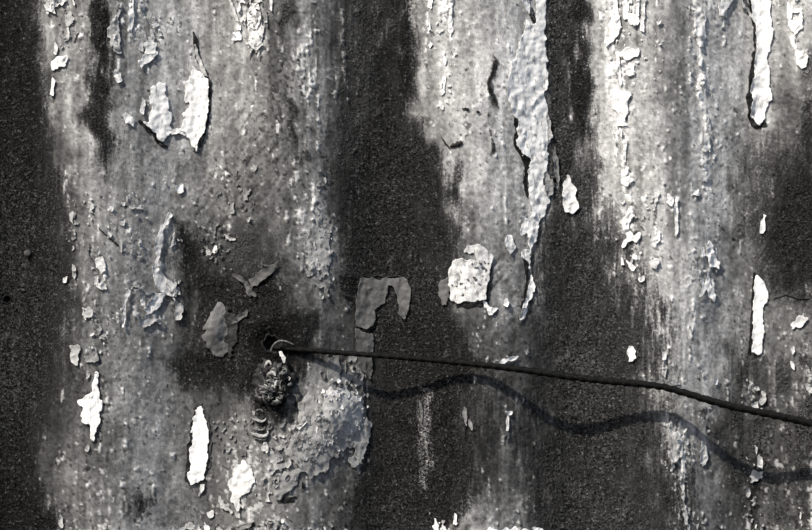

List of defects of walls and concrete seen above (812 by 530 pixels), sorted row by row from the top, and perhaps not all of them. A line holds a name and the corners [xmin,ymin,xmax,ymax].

damp [0,0,78,530]
damp [78,0,120,182]
peeling [70,212,184,452]
peeling [123,31,212,153]
damp [169,219,325,439]
damp [326,0,497,530]
peeling [438,244,509,316]
peeling [504,0,579,320]
damp [509,0,696,530]
peeling [718,0,774,129]
damp [722,95,812,306]
peeling [151,403,341,530]